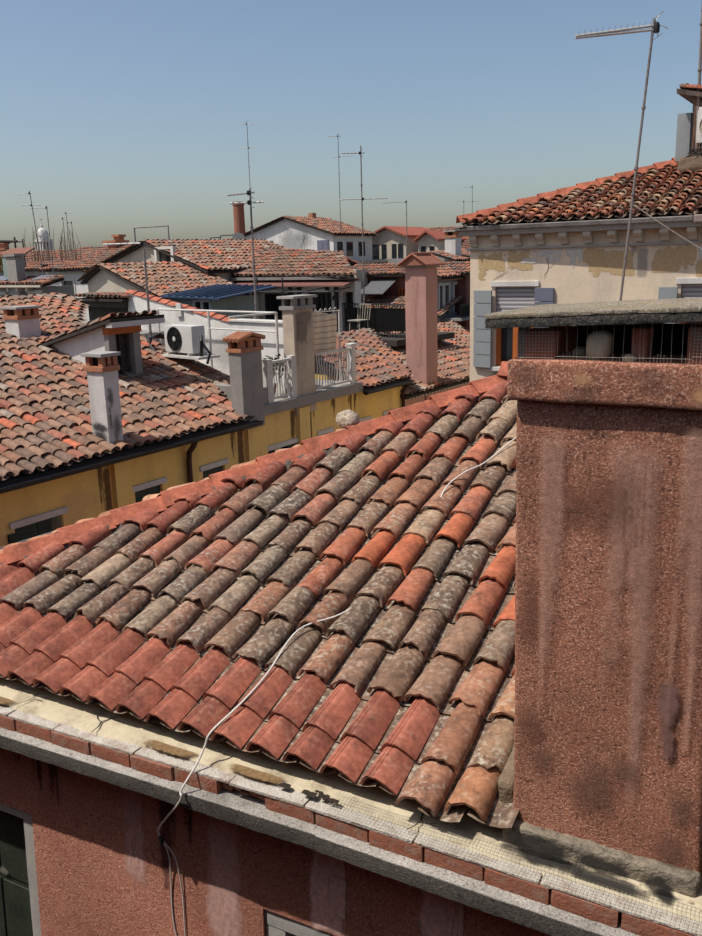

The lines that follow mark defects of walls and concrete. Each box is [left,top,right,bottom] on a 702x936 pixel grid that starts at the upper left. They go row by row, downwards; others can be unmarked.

flaking render [478,247,635,280]
flaking render [652,245,702,277]
leakage [93,423,106,440]